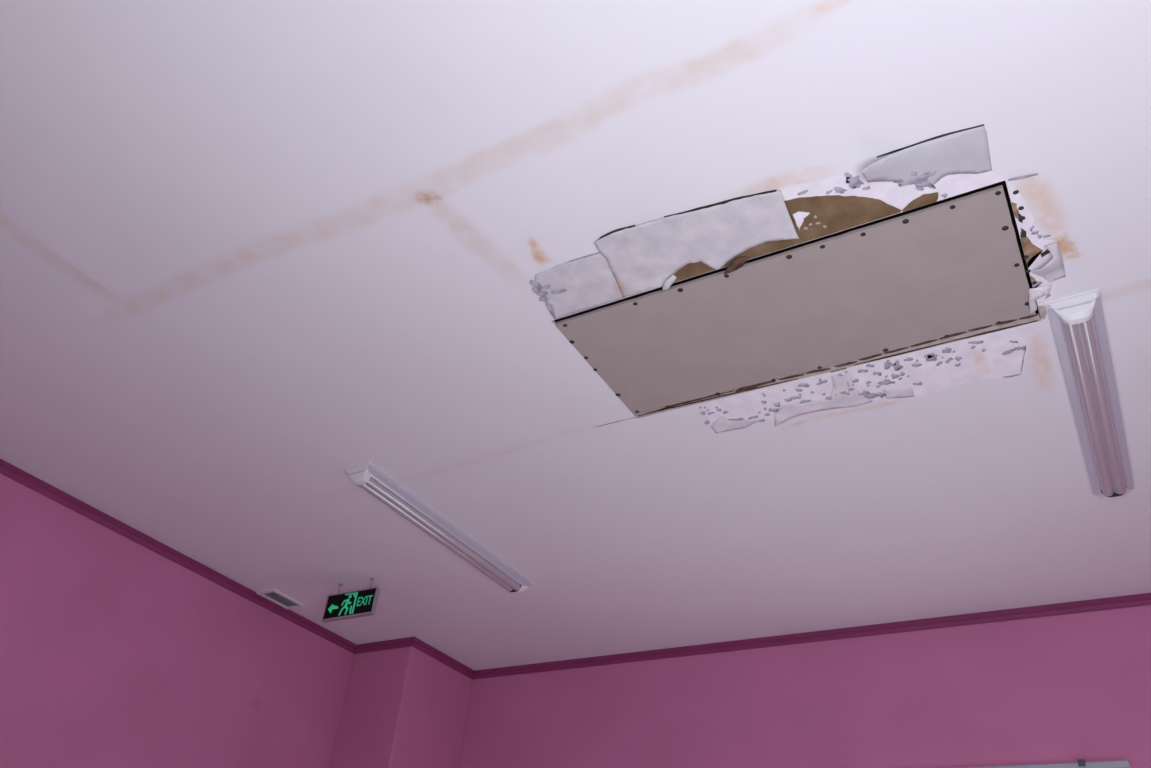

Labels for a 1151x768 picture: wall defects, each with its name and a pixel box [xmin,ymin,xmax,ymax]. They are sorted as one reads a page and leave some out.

peeling [530,124,1066,434]